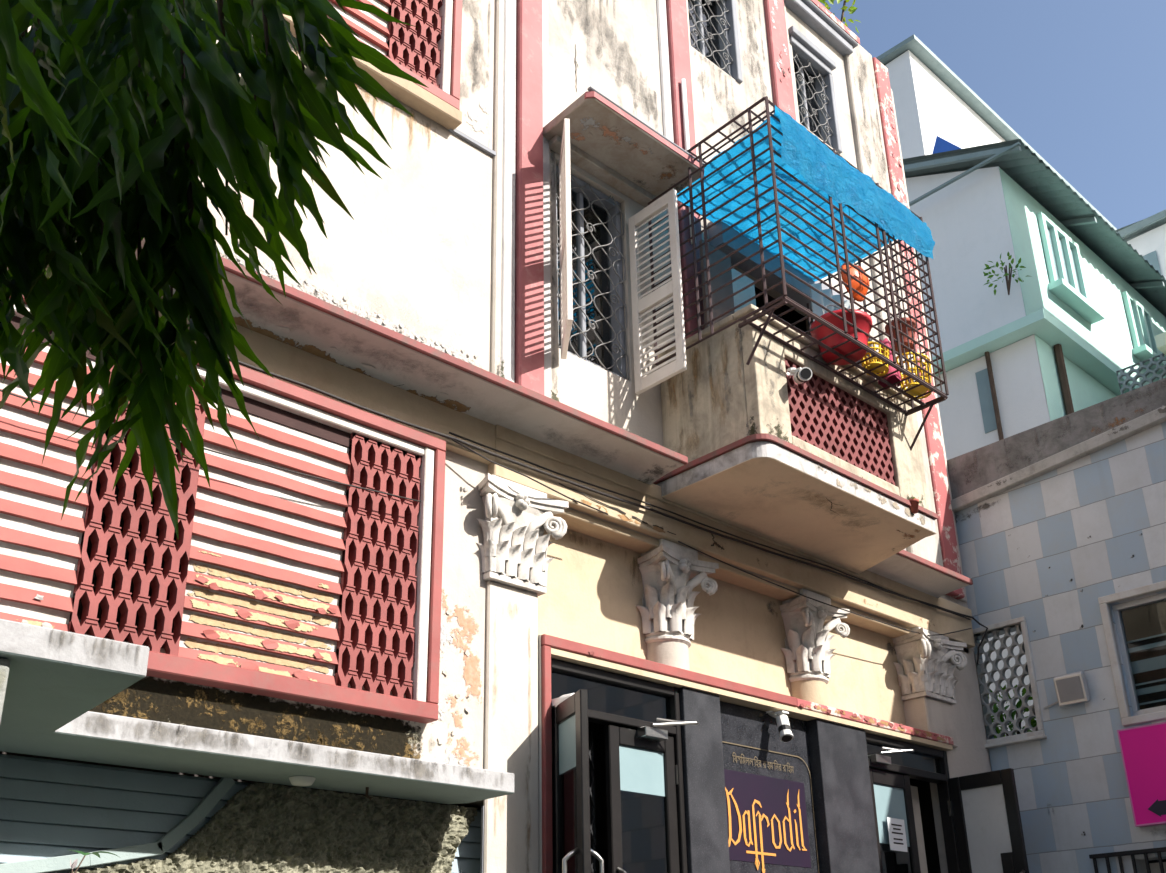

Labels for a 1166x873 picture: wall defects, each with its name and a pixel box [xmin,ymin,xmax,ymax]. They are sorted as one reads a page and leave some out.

damp [572,0,658,115]
peeling [883,97,907,206]
peeling [184,551,337,682]
damp [136,722,243,747]
damp [388,756,434,777]
peeling [432,589,482,767]